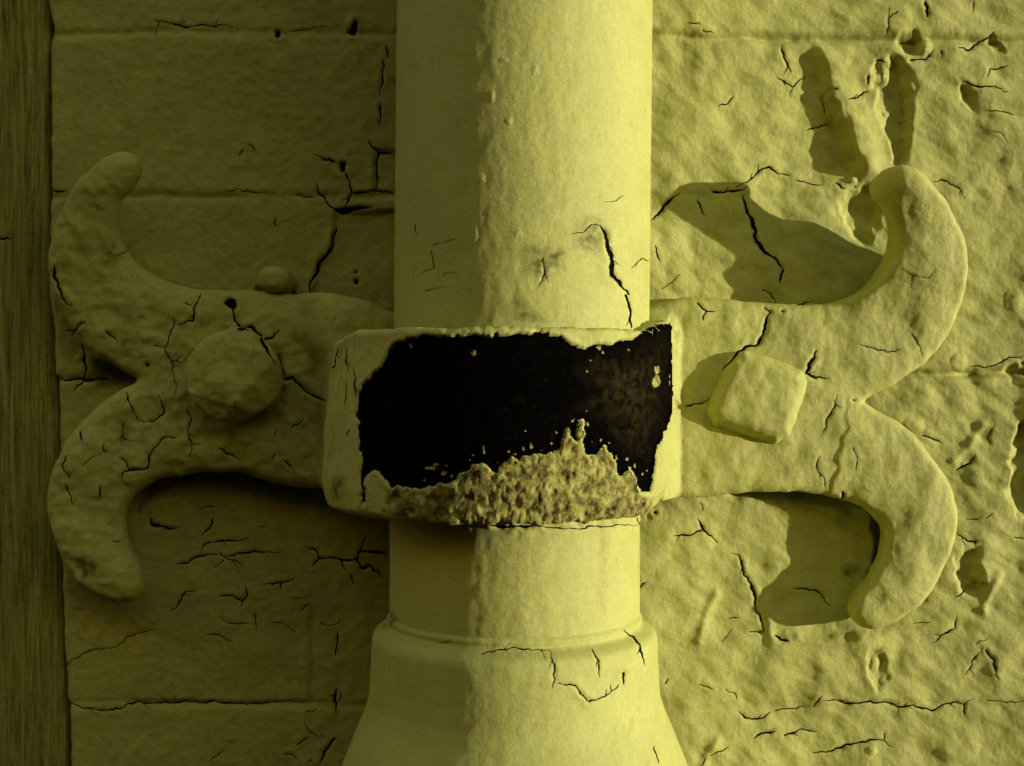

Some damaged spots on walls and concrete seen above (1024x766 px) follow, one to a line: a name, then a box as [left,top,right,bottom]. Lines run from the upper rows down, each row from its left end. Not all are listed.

crack [807,7,995,131]
crack [297,46,394,292]
crack [571,224,680,328]
crack [652,163,870,368]
crack [232,308,360,467]
peeling [356,323,673,526]
crack [150,506,389,655]
crack [675,503,789,642]
crack [481,630,645,702]
crack [700,638,1020,753]